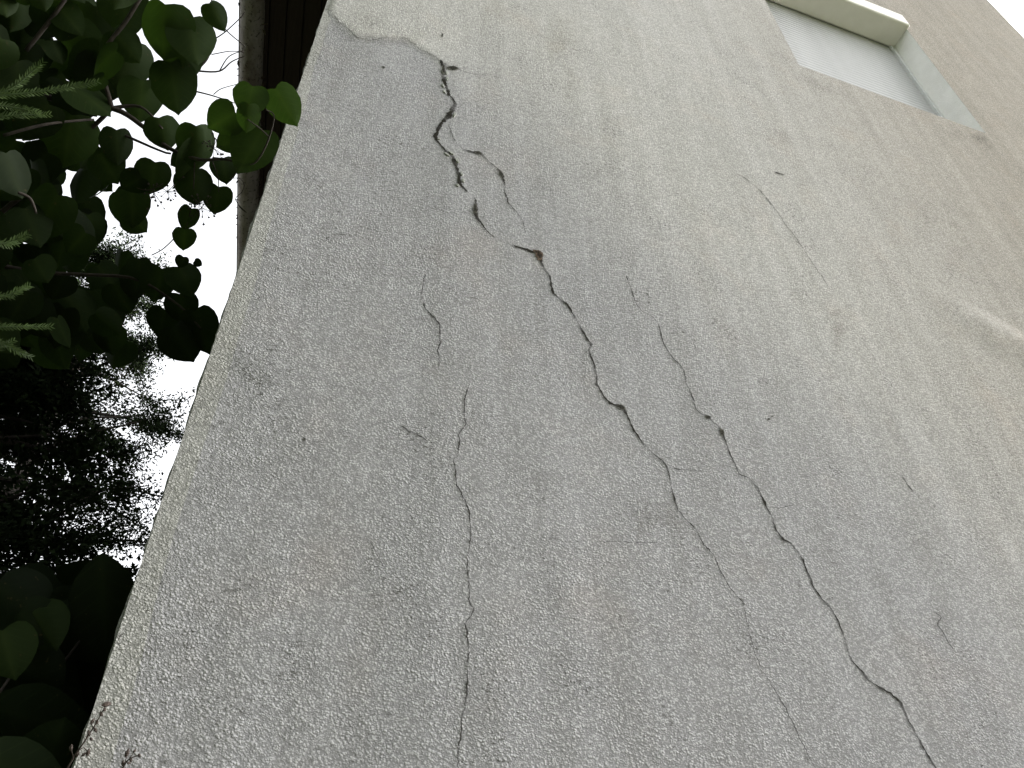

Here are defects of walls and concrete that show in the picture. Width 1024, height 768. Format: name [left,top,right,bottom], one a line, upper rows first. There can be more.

crack [421,274,441,366]
crack [433,60,815,768]
crack [626,276,937,768]